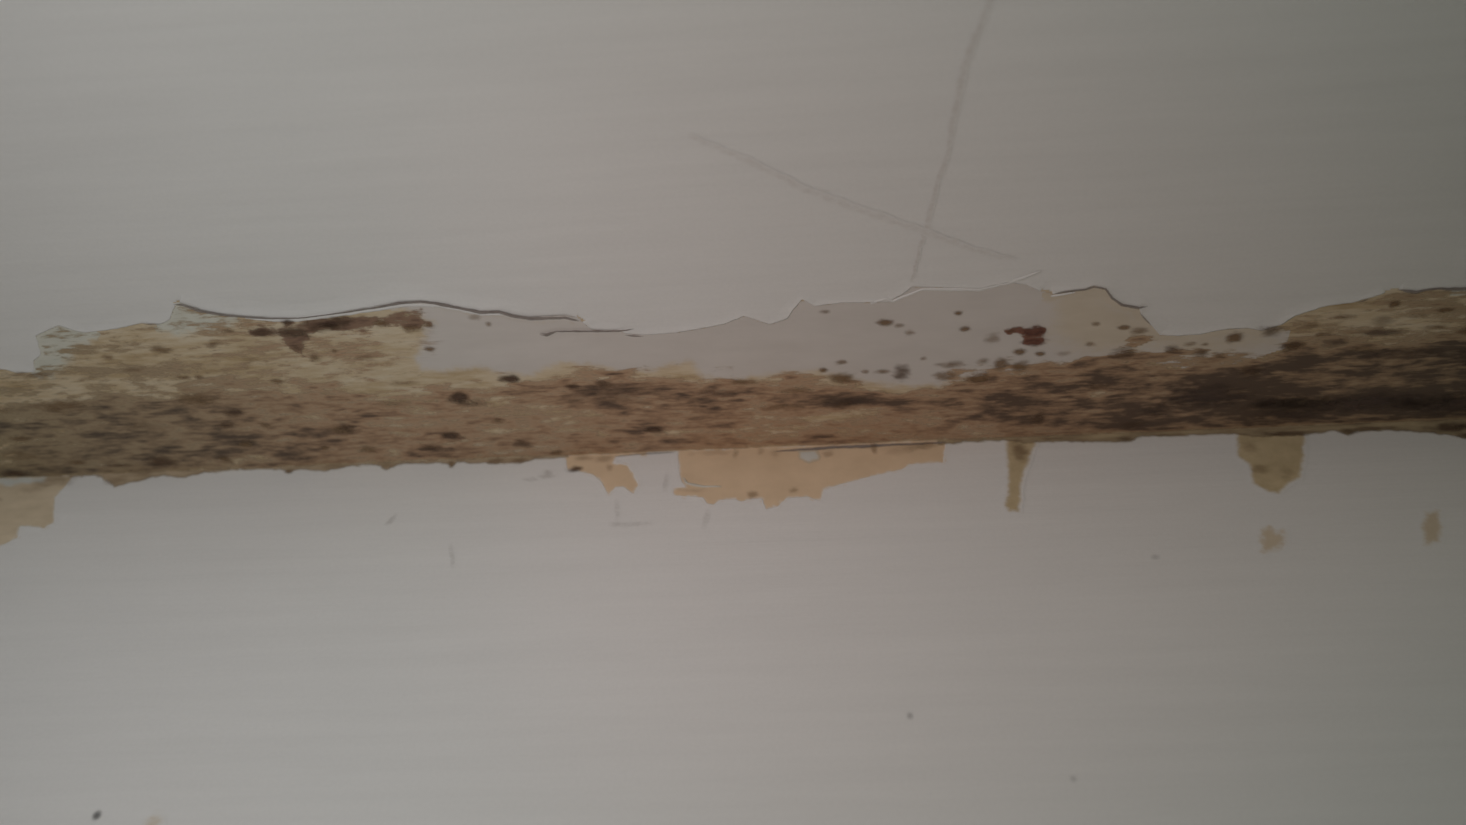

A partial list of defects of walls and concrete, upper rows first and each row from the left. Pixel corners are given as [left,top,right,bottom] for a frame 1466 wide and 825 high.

leakage [0,291,1466,478]
peeling [0,270,1466,551]